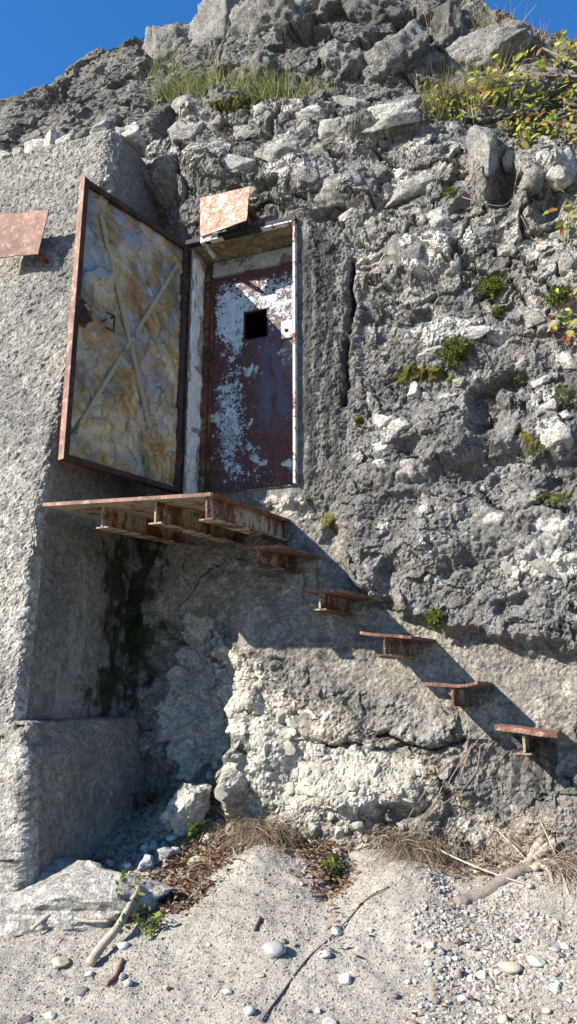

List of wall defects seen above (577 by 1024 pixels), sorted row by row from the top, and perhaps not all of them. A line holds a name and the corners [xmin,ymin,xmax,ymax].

peeling [185,257,268,494]
peeling [248,283,293,314]
water stain [84,535,169,735]
crack [313,732,466,766]